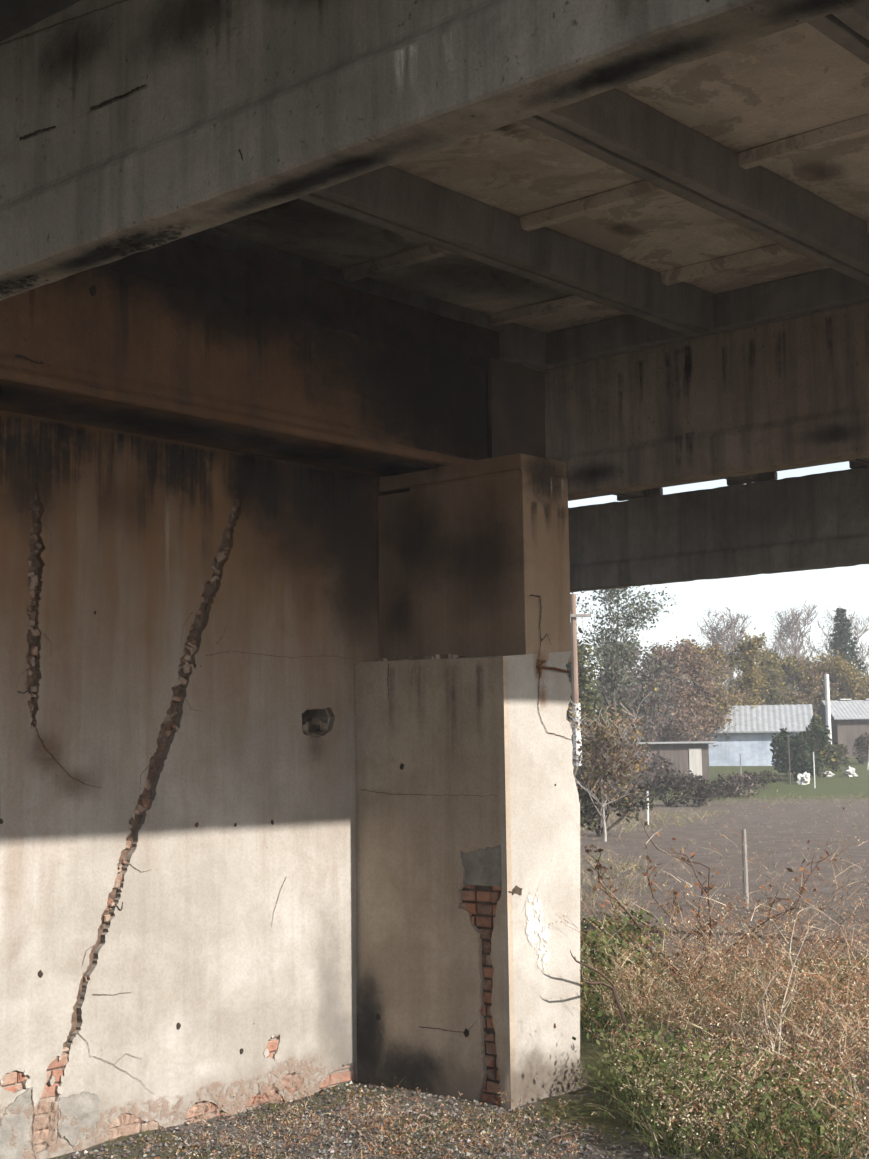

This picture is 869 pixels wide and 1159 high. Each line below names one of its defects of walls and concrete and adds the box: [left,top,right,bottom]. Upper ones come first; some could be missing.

water stain [779,0,854,18]
water stain [555,42,705,98]
water stain [237,155,386,209]
water stain [59,226,187,271]
crack [16,438,102,788]
crack [31,454,352,1158]
flaking render [460,845,502,1106]
flaking render [263,1034,280,1060]
water stain [357,979,434,1091]
flaking render [0,1047,69,1152]
flaking render [184,1070,304,1123]
flaking render [319,1063,357,1090]